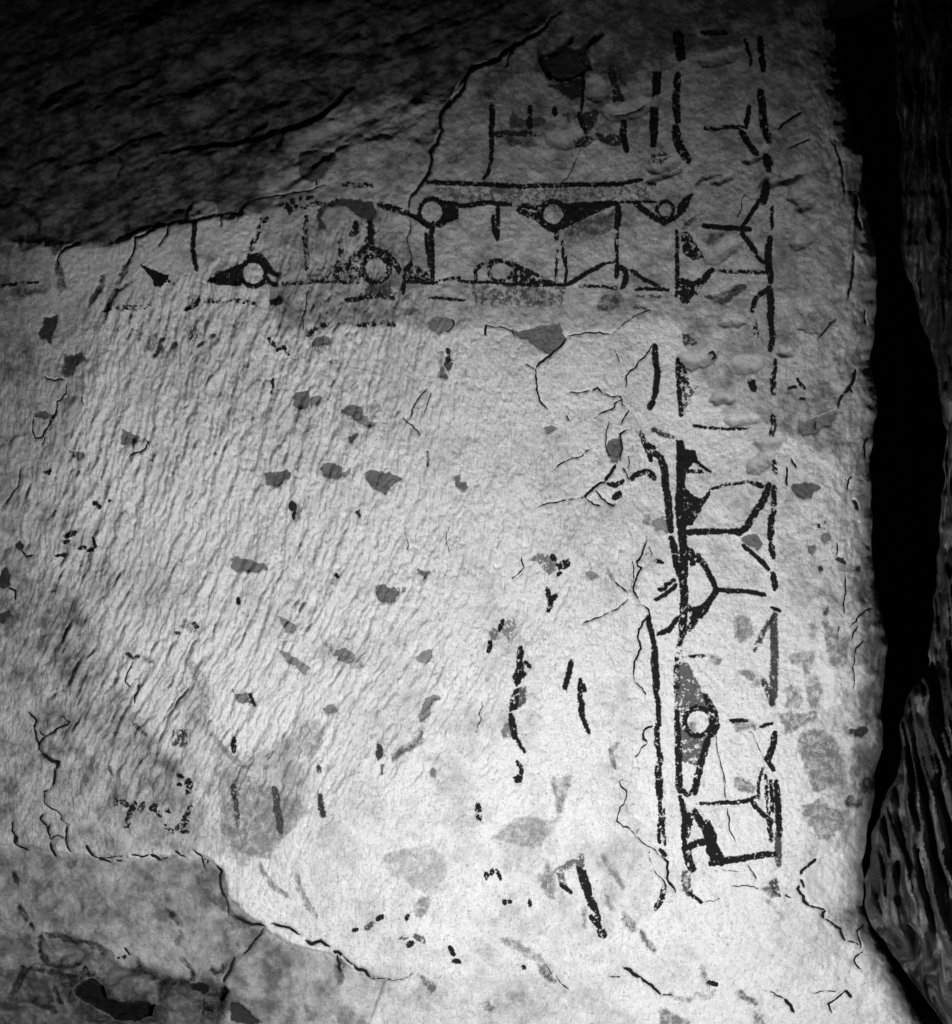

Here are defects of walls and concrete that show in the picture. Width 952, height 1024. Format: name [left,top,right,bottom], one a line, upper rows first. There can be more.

crack [406,8,602,274]
spalling [298,150,336,182]
spalling [316,198,377,230]
spalling [18,234,63,254]
spalling [484,323,566,354]
crack [526,310,653,507]
crack [11,712,412,983]
crack [705,865,759,902]
crack [11,872,108,1013]
crack [785,858,865,1013]
spalling [230,1001,260,1024]